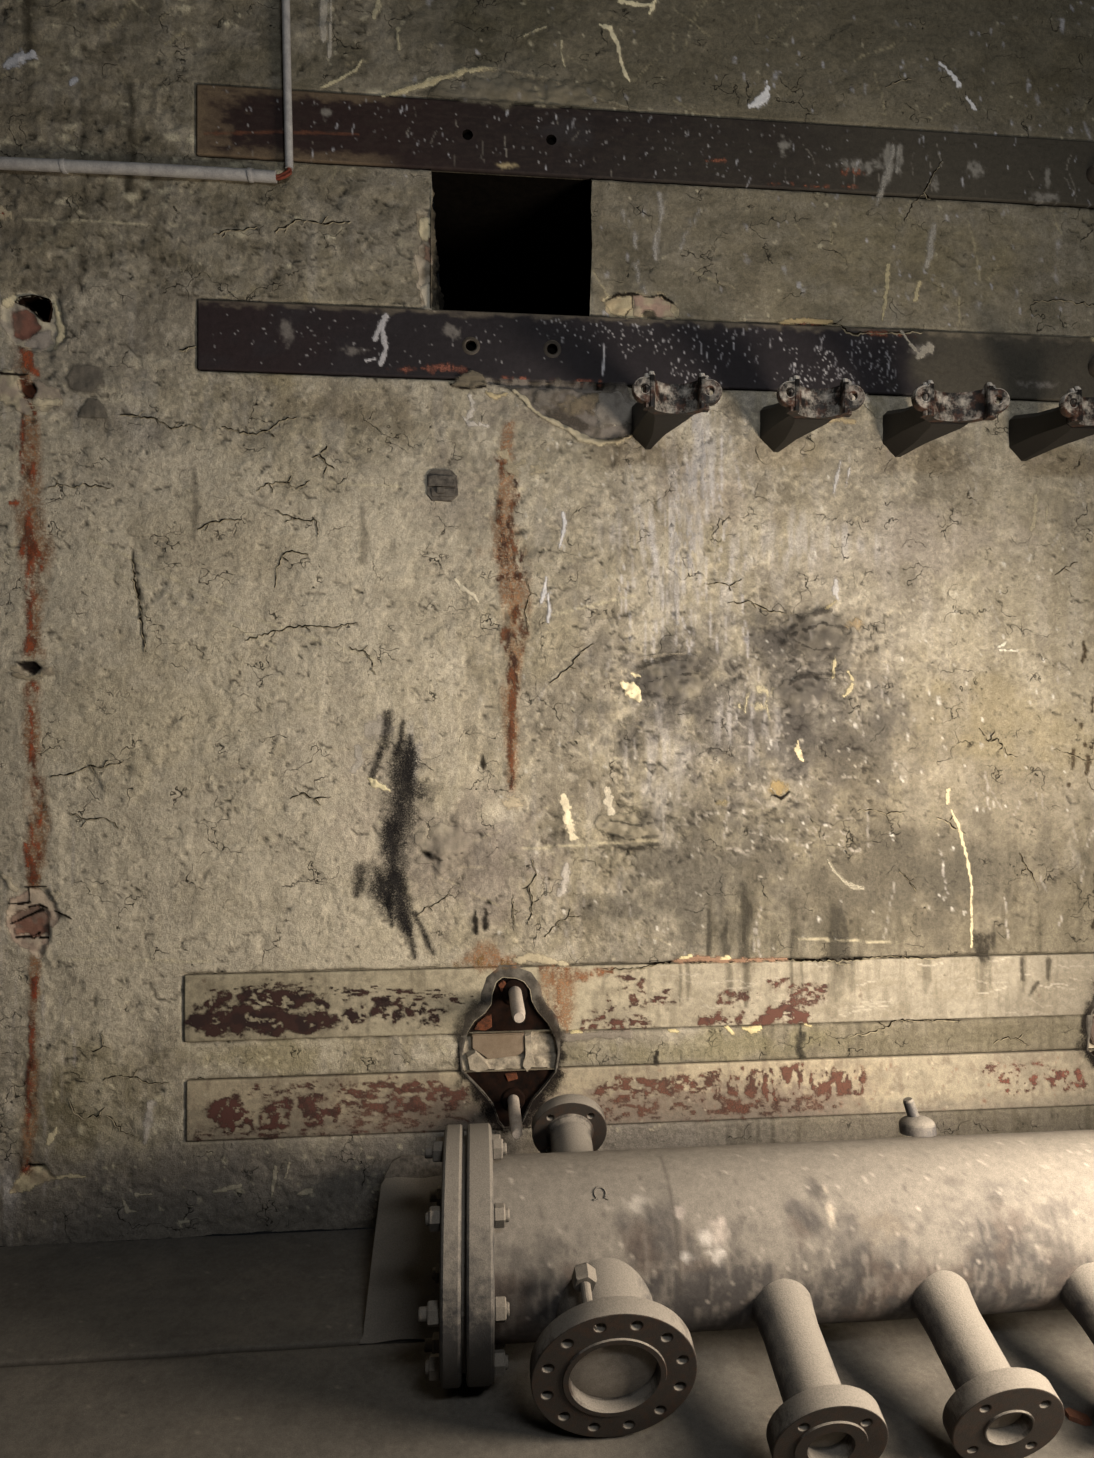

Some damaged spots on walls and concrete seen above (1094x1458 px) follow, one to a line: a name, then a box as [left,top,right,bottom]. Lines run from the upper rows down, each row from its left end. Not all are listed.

spalling [0,290,65,353]
spalling [602,292,679,320]
rust [9,347,53,658]
crack [197,446,335,588]
crack [130,559,146,652]
crack [245,622,376,675]
rust [494,422,530,790]
rust [23,681,50,889]
spalling [1,874,72,959]
crack [512,859,581,937]
water stain [707,883,750,964]
rust [21,956,41,1175]